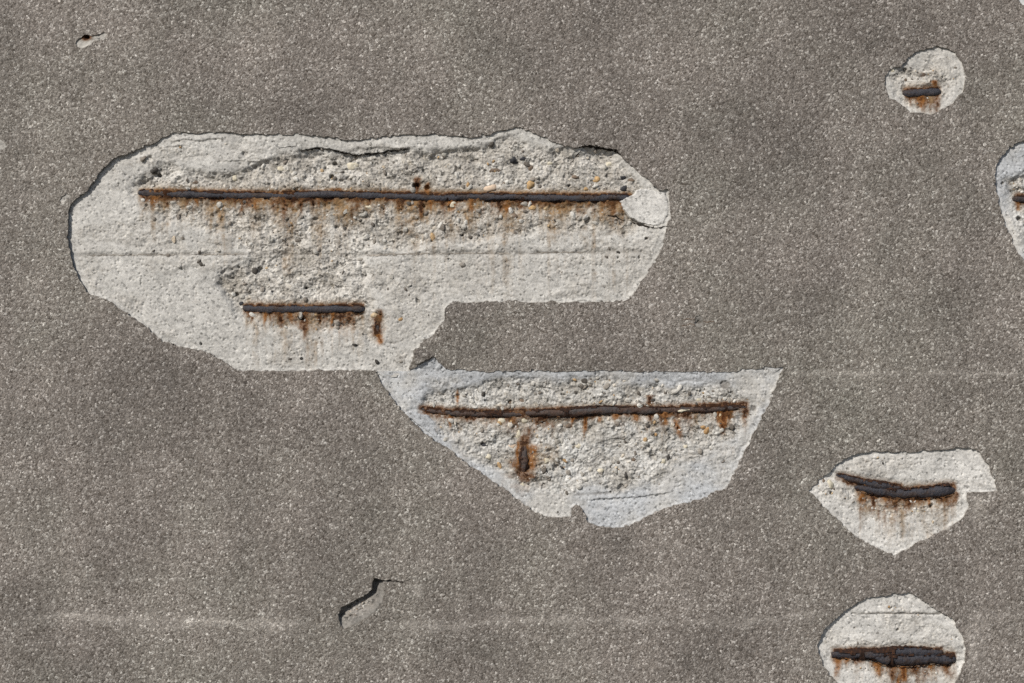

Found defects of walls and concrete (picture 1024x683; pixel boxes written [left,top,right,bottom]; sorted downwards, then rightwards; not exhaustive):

spalling [885,46,966,115]
corrosion [140,177,632,231]
spalling [995,141,1024,260]
corrosion [244,303,364,337]
corrosion [373,310,383,343]
spalling [60,127,784,528]
corrosion [420,391,600,481]
corrosion [613,395,749,434]
corrosion [841,473,959,518]
spalling [809,447,997,556]
spalling [338,578,392,629]
spalling [817,592,966,683]